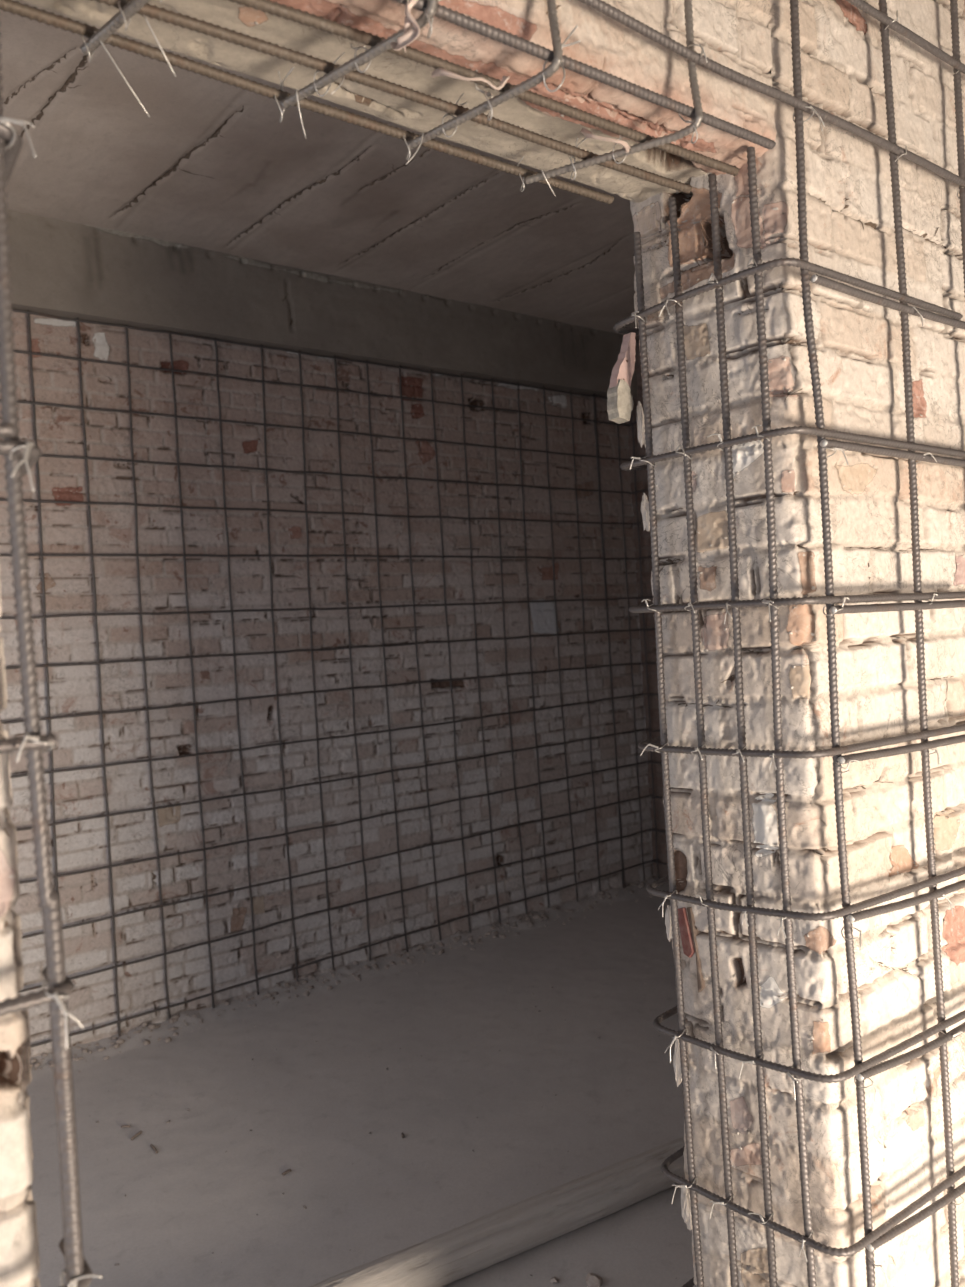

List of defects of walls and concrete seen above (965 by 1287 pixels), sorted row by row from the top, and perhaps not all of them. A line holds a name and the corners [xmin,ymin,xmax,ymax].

spalling [239,0,397,39]
spalling [438,0,537,41]
crack [109,106,244,218]
crack [227,146,430,246]
spalling [0,25,716,1287]
spalling [578,0,965,1287]